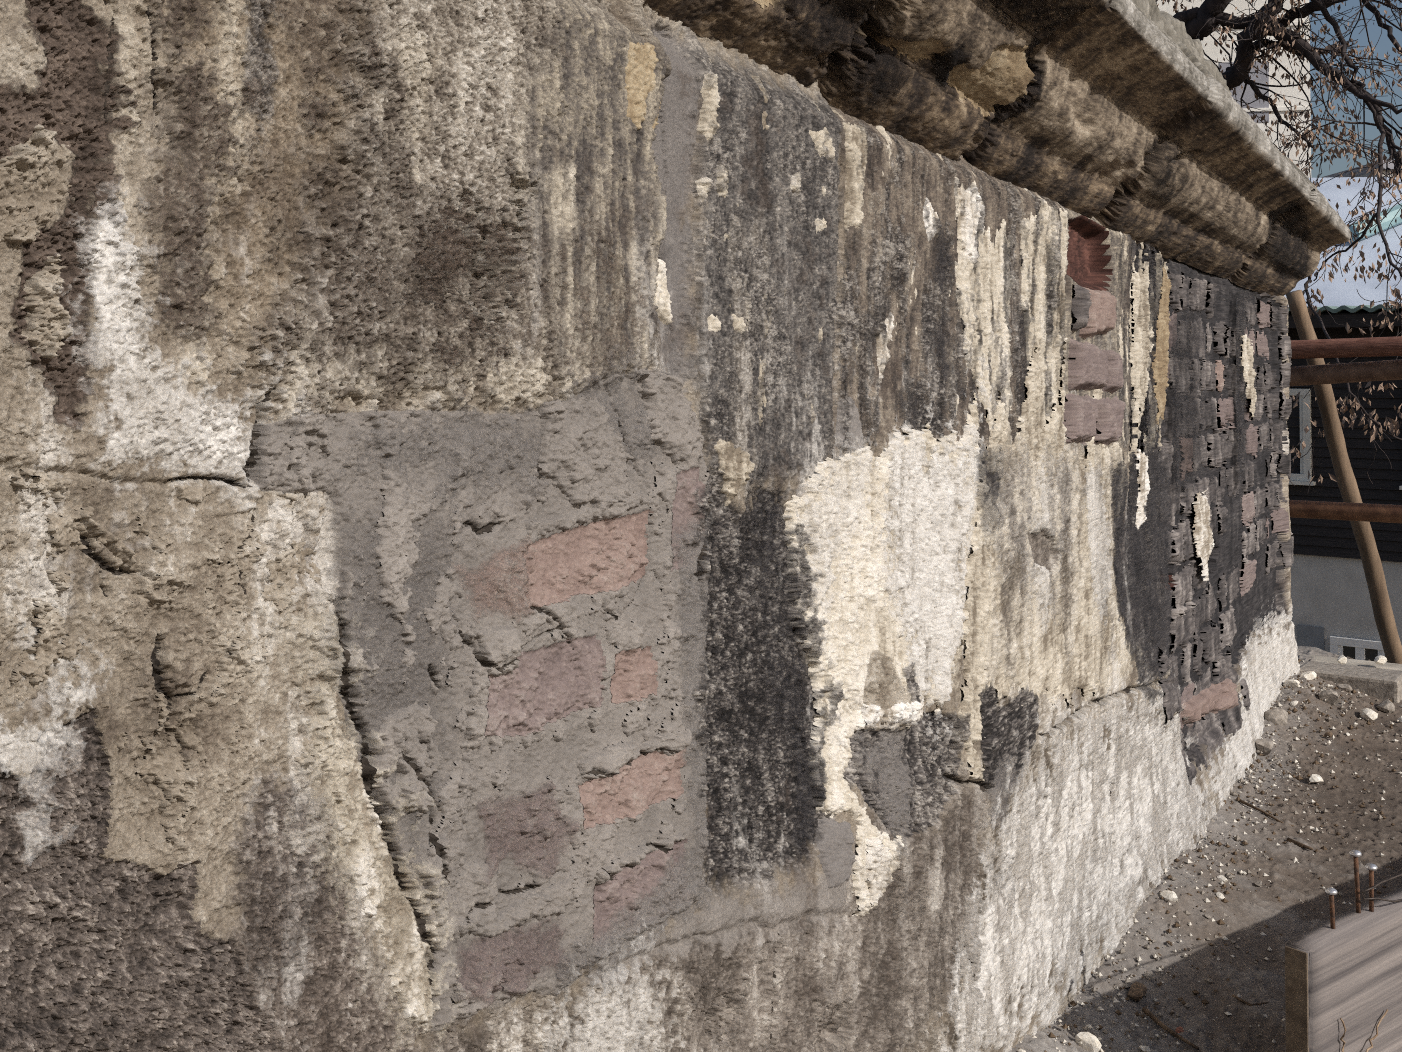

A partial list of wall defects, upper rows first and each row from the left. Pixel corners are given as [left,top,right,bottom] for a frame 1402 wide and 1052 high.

peeling [696,53,721,141]
water stain [974,0,1088,134]
water stain [695,0,1069,669]
peeling [0,468,101,687]
peeling [781,153,1294,917]
water stain [0,657,96,771]
water stain [235,789,341,984]
crack [334,612,450,992]
peeling [129,374,660,1031]
crack [467,871,556,923]
crack [943,774,995,792]
crack [1041,689,1131,735]